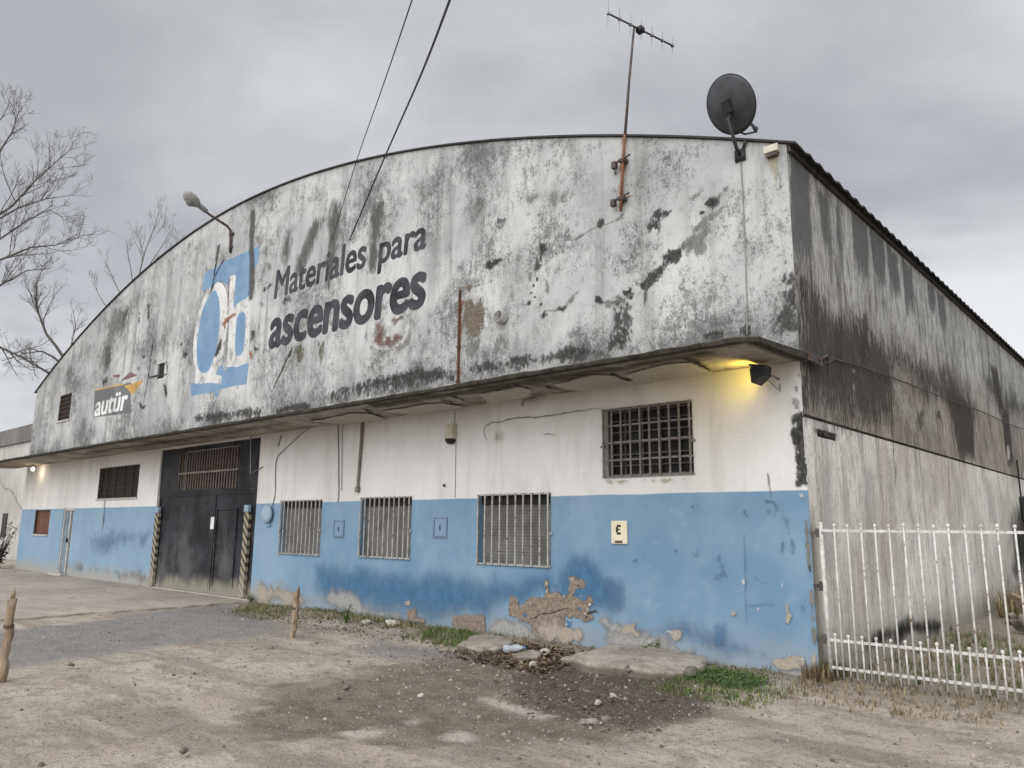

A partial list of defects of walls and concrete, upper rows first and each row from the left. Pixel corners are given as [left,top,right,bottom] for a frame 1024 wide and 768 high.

damp [87,290,149,384]
damp [249,210,272,306]
damp [282,200,341,289]
damp [328,188,727,409]
damp [773,156,976,568]
damp [195,407,261,434]
damp [276,402,310,426]
damp [983,365,1024,465]
peeling [452,576,694,655]
peeling [771,589,817,676]